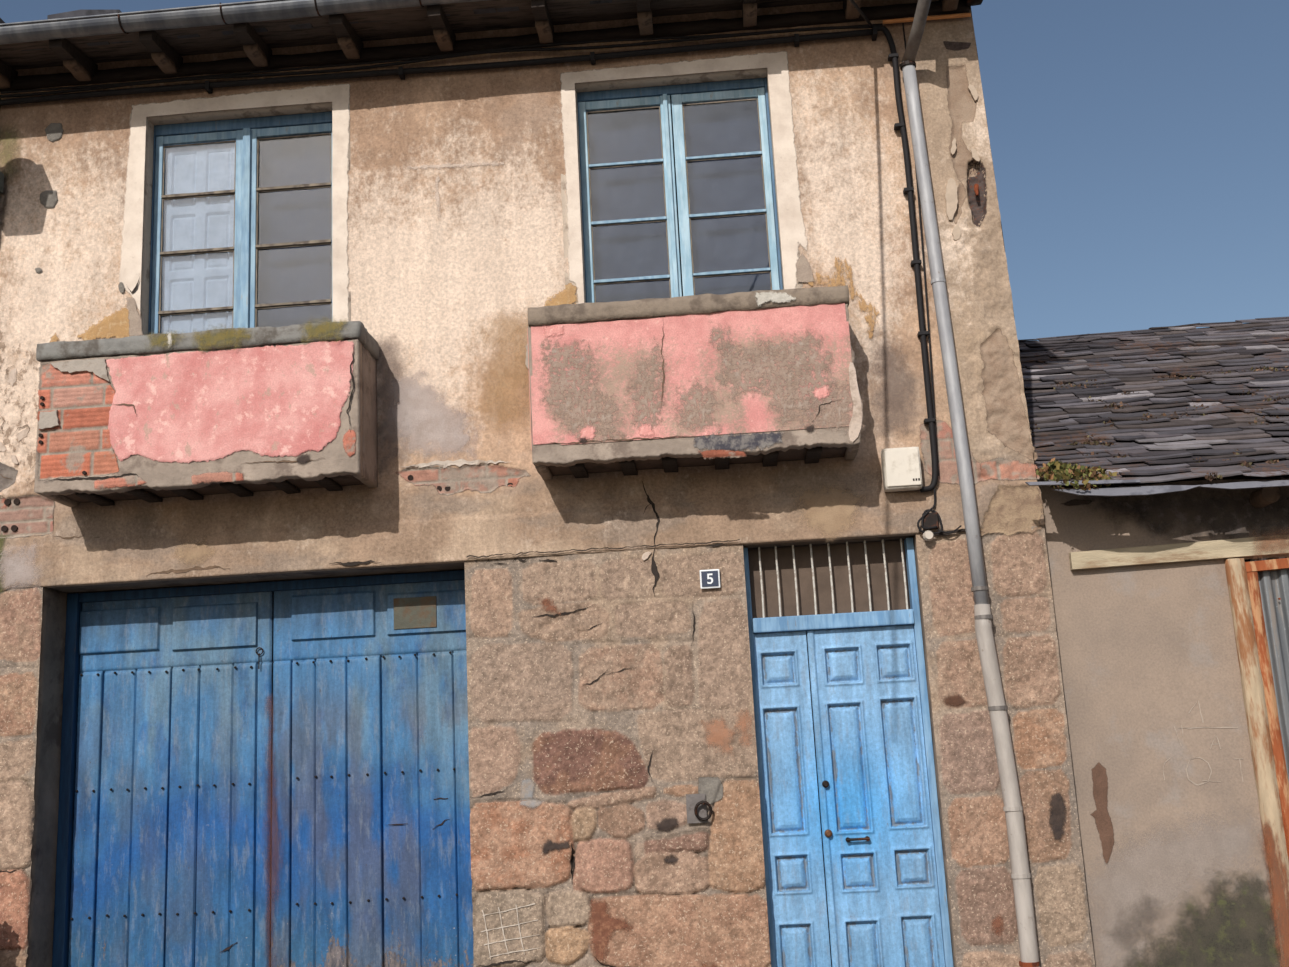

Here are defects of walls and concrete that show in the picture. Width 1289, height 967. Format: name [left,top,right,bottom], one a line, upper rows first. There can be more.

flaking render [943,41,987,241]
peeling [77,308,130,340]
peeling [808,257,879,339]
flaking render [0,333,145,538]
flaking render [191,471,243,484]
flaking render [343,430,356,456]
flaking render [396,459,531,496]
peeling [539,328,862,445]
flaking render [701,450,746,459]
crack [467,481,740,596]
water stain [1093,823,1281,967]
corrosion [1263,814,1289,967]